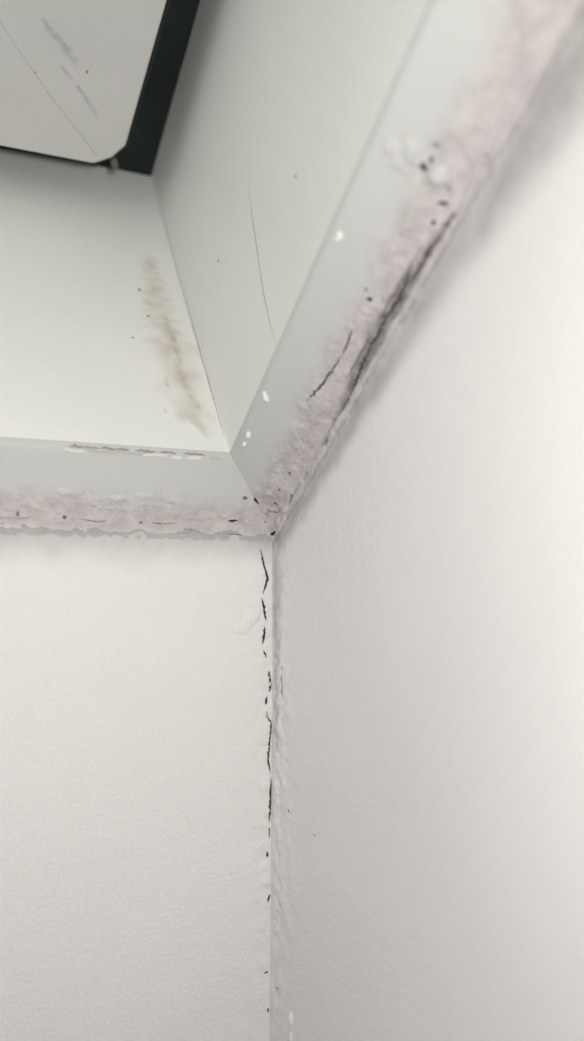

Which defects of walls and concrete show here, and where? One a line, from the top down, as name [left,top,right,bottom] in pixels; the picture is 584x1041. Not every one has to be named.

crack [306,213,455,412]
crack [228,472,305,857]